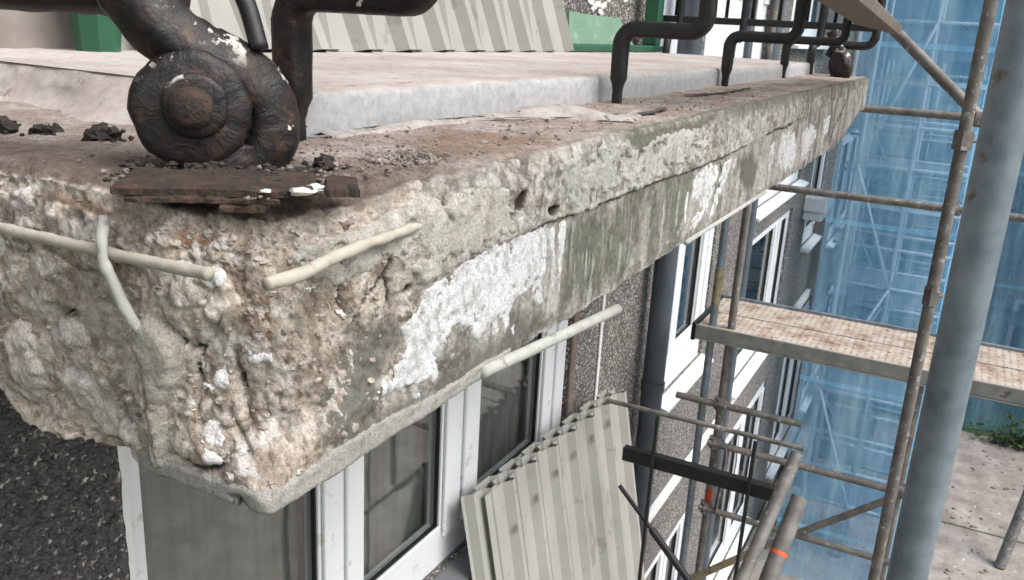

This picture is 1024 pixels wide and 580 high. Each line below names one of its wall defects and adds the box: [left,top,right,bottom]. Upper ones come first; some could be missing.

leakage [740,157,757,188]
spalling [0,182,566,489]
leakage [320,325,397,447]
leakage [434,256,554,394]